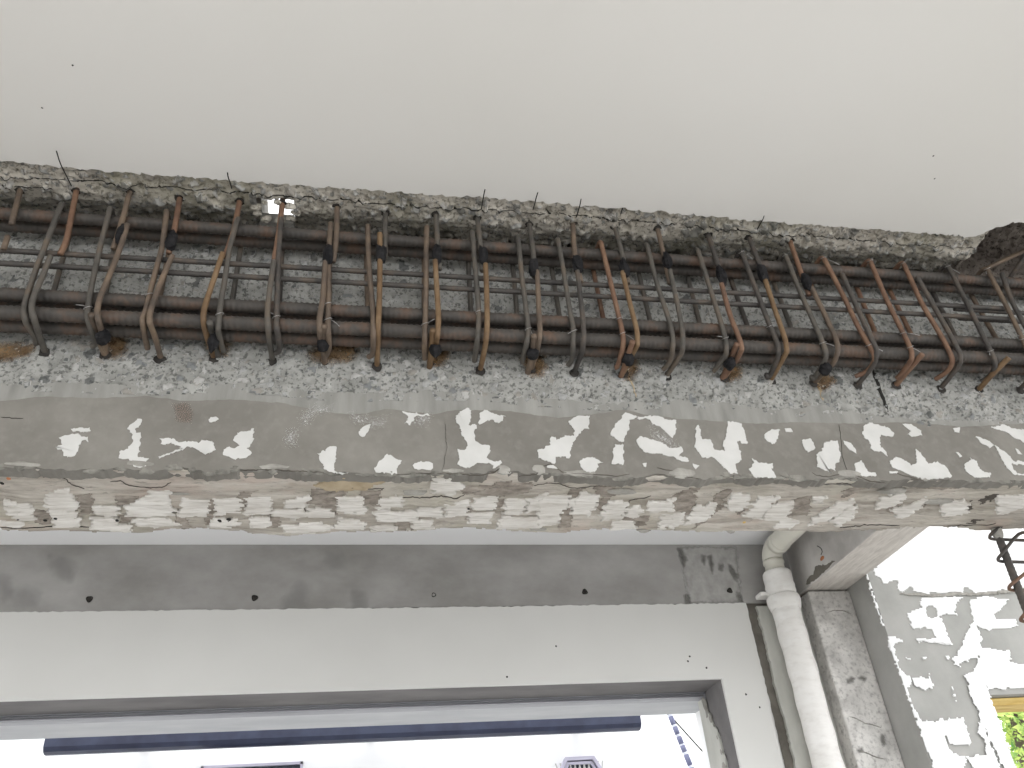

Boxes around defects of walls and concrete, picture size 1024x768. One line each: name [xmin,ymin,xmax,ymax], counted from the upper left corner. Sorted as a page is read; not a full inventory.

spalling [250,199,301,224]
crack [0,176,975,250]
spalling [0,222,1024,339]
corrosion [0,343,33,361]
corrosion [311,346,357,362]
crack [872,369,889,412]
peeling [0,332,1024,768]